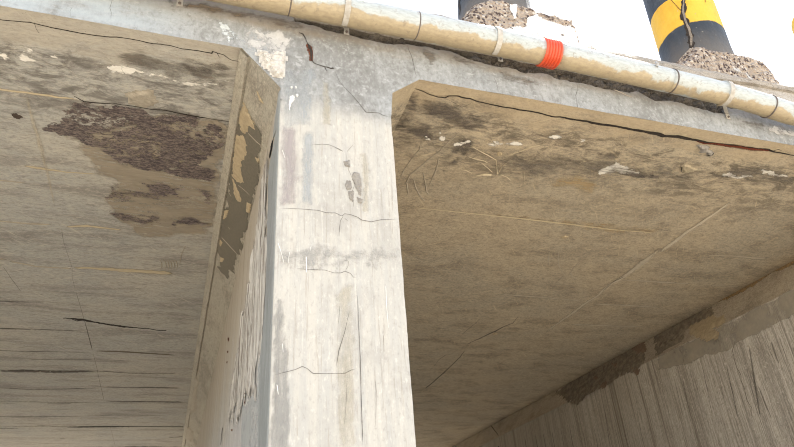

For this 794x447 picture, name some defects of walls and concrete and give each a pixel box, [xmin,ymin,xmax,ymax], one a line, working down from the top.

damp [107,54,229,86]
damp [186,3,253,17]
spalling [219,22,291,79]
crack [299,32,384,116]
crack [408,49,794,156]
crack [671,0,695,48]
spalling [42,102,268,425]
crack [63,318,166,331]
crack [426,318,517,388]